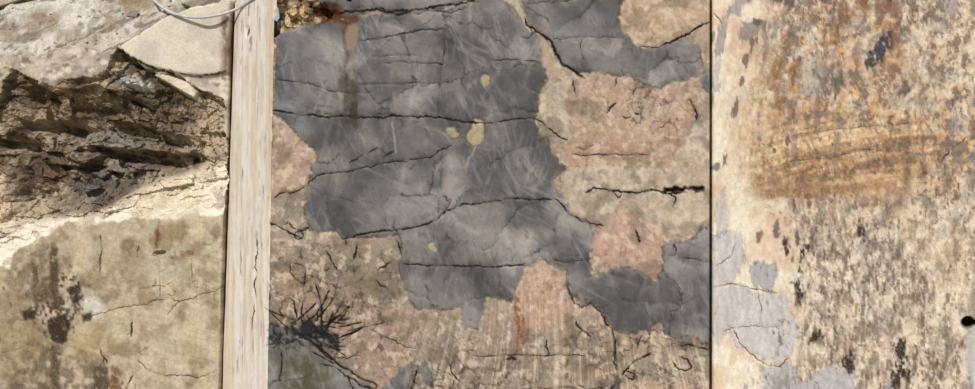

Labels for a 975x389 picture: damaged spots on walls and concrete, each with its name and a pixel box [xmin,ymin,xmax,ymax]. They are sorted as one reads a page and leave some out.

spalling [274,0,352,38]
crack [340,0,474,41]
crack [500,19,584,90]
crack [641,15,722,48]
crack [272,110,646,156]
spalling [0,47,231,270]
crack [585,187,703,203]
crack [240,197,604,389]
damp [23,248,91,389]
crack [473,293,650,389]
crack [672,326,788,371]
damp [94,366,108,389]